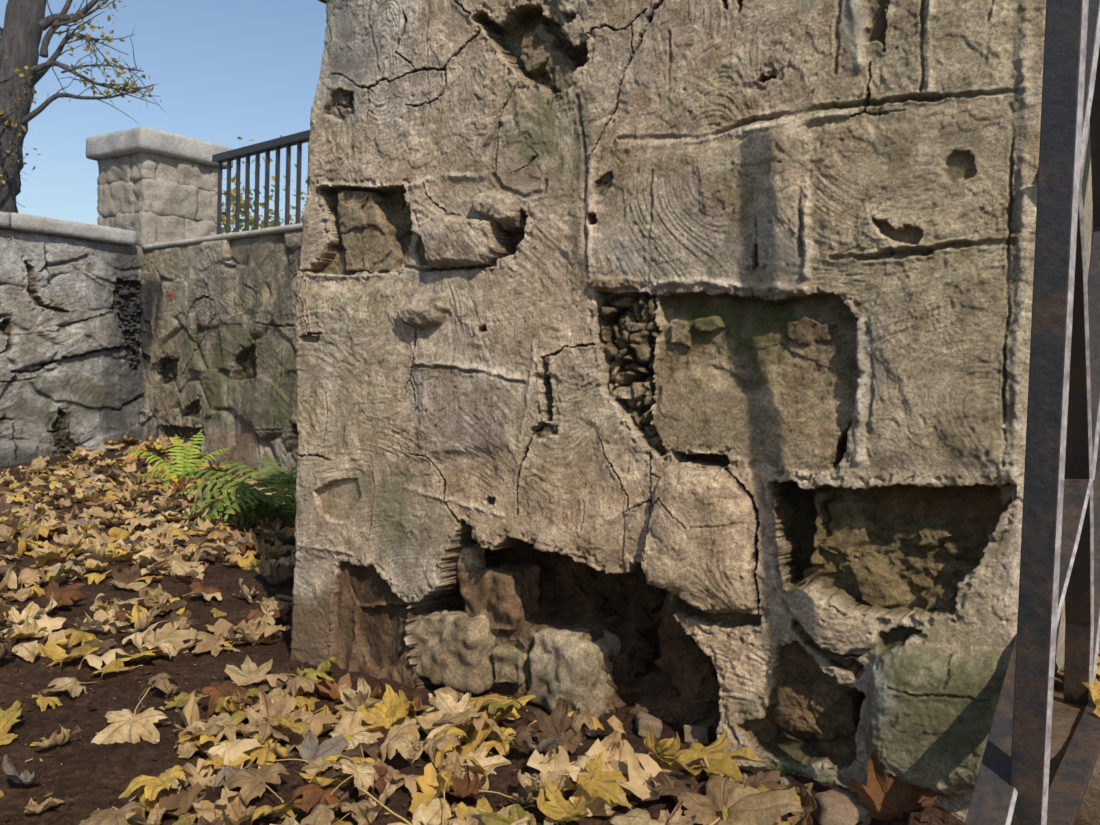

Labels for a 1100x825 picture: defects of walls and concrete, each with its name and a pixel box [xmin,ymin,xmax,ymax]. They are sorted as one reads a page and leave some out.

crack [328,0,481,112]
spalling [475,4,588,94]
crack [587,0,664,153]
spalling [865,0,889,43]
crack [850,0,906,117]
spalling [307,184,429,275]
crack [0,243,123,382]
crack [598,434,686,561]
crack [725,467,760,603]
spalling [595,291,1012,653]
spalling [334,528,762,736]
spalling [741,619,866,768]